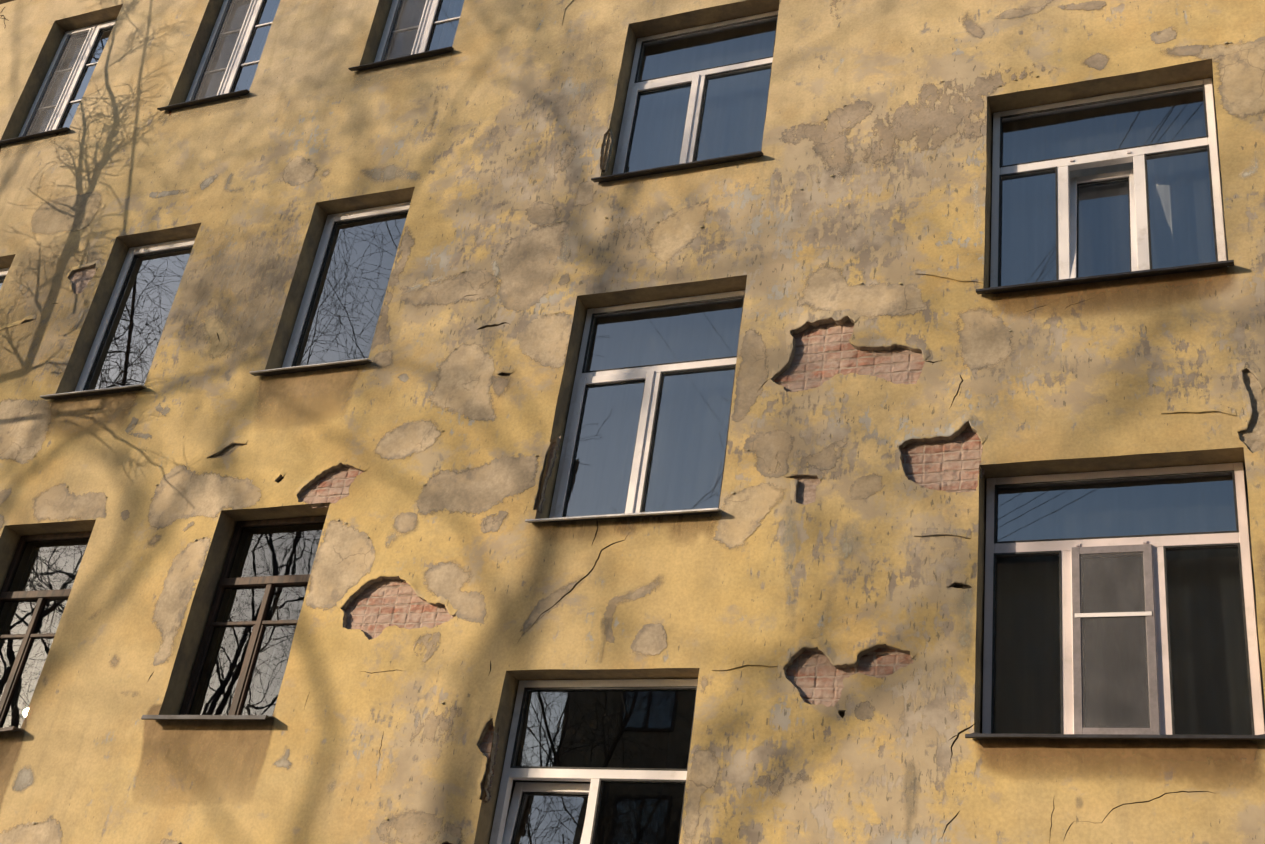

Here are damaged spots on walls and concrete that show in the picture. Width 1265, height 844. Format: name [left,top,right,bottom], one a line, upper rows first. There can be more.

peeling [779,65,1057,183]
peeling [0,399,51,464]
peeling [148,465,261,666]
spalling [204,435,249,458]
spalling [294,420,561,662]
peeling [428,343,516,422]
crack [519,521,630,640]
peeling [713,430,825,549]
spalling [771,265,930,392]
spalling [893,411,987,493]
spalling [776,632,917,721]
crack [1049,791,1212,844]